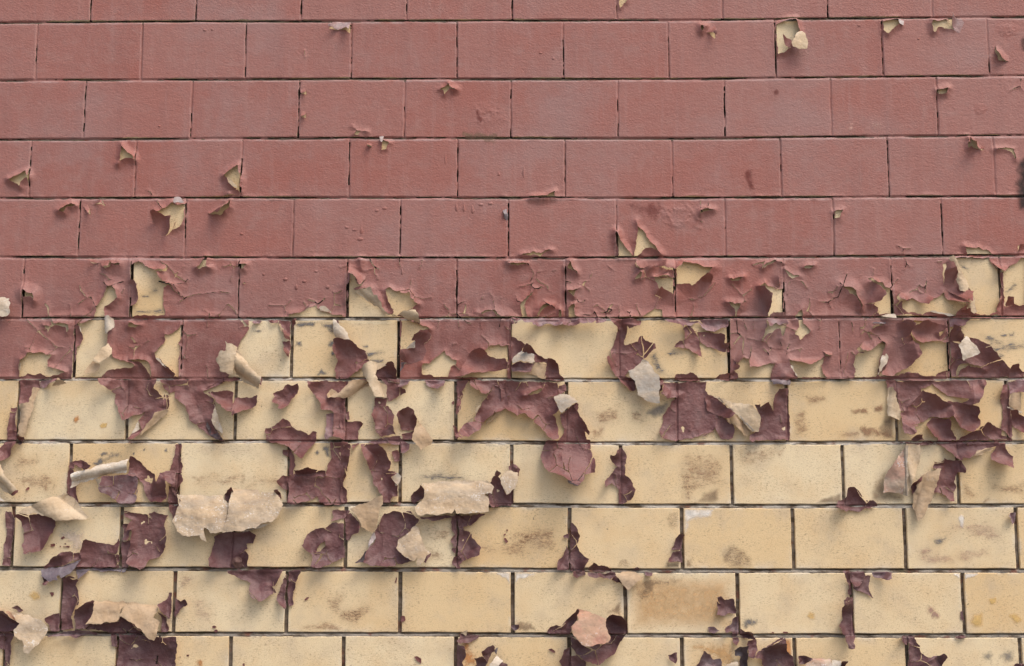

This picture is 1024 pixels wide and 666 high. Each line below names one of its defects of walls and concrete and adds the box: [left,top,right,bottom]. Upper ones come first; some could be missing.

peeling [769,13,808,62]
peeling [150,195,193,237]
peeling [0,250,257,461]
peeling [608,213,1024,501]
peeling [208,242,656,609]
peeling [836,487,877,512]
peeling [0,444,187,666]
peeling [457,634,487,666]
peeling [547,609,628,666]
peeling [708,596,813,666]
peeling [839,571,892,666]
peeling [902,635,948,666]